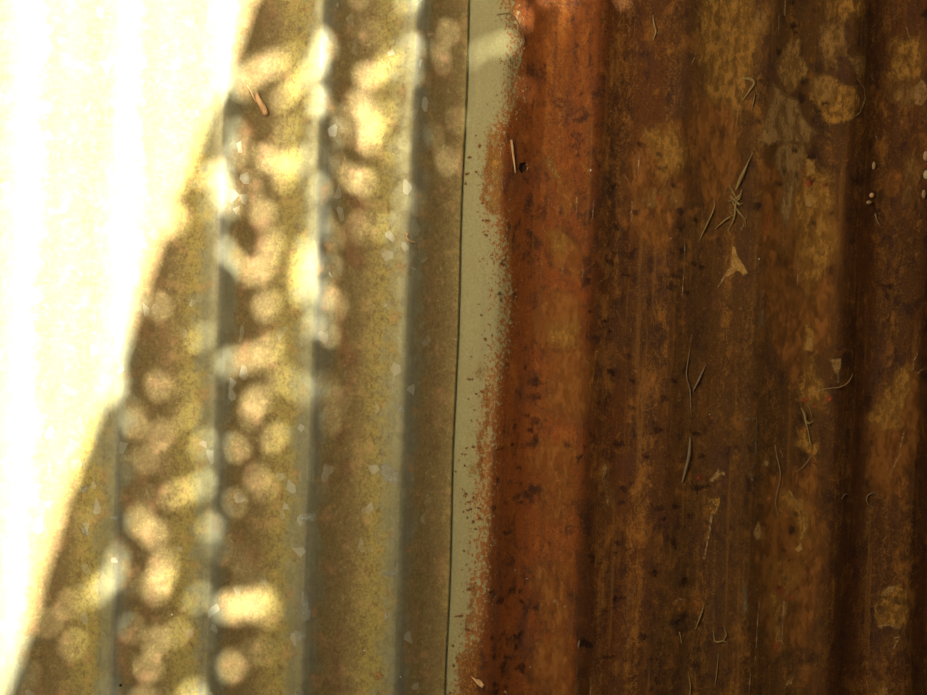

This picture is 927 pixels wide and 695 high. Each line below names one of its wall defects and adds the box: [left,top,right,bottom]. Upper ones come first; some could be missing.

corrosion [445,0,927,695]